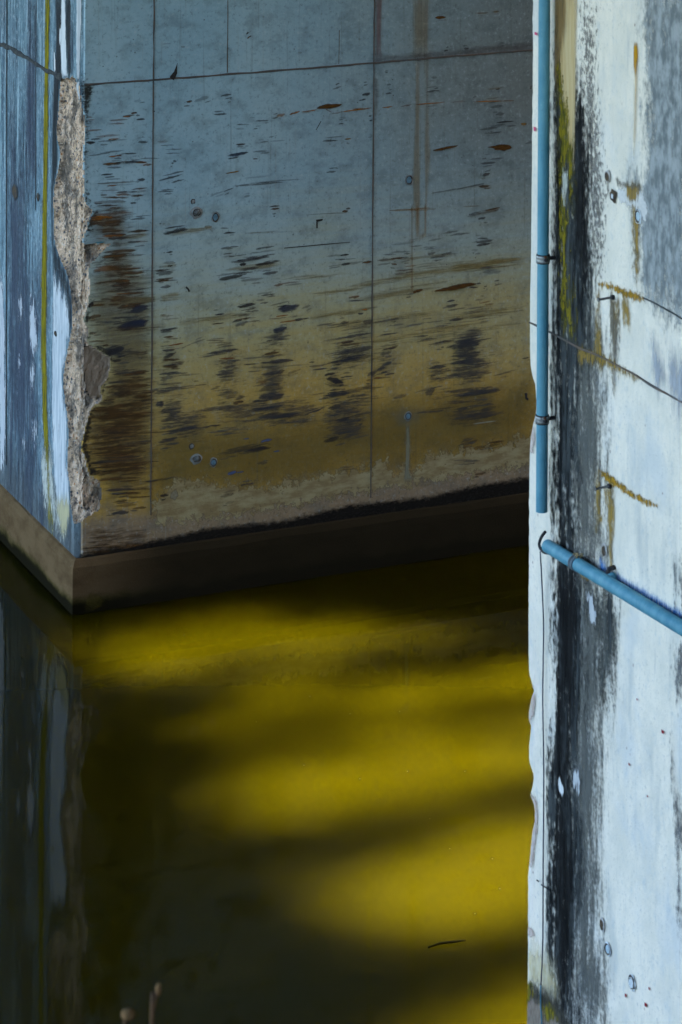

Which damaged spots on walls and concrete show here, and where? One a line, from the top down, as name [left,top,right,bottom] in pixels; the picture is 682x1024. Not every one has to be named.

spalling [53,75,111,524]
leakage [86,138,183,331]
leakage [78,228,531,558]
rust [277,104,369,116]
leakage [549,0,630,568]
leakage [527,556,621,1024]